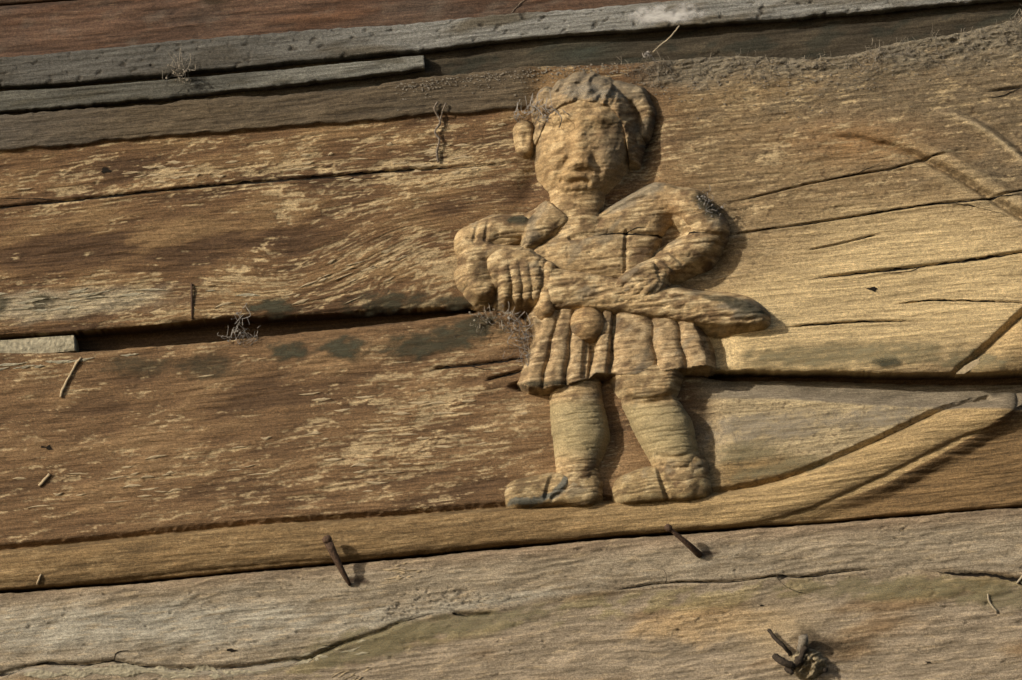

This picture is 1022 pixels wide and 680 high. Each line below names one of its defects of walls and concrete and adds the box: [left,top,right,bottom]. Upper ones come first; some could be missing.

crack [741,150,960,201]
crack [598,227,662,238]
crack [689,190,1022,250]
crack [808,252,1022,280]
crack [794,299,1019,327]
crack [937,571,1022,585]